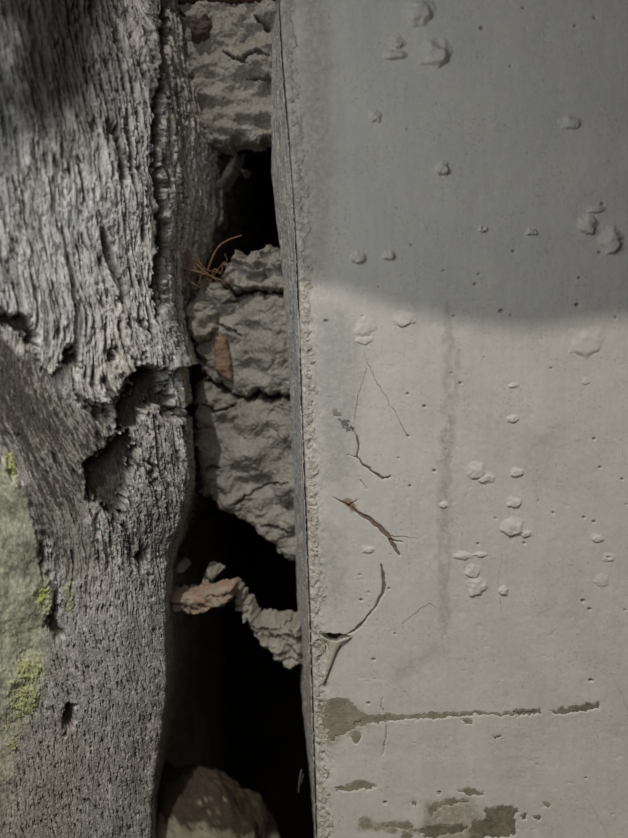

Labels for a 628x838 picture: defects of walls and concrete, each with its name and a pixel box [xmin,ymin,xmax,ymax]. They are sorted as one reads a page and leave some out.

crack [333,352,418,634]
spalling [280,0,541,838]
peeling [552,702,599,714]